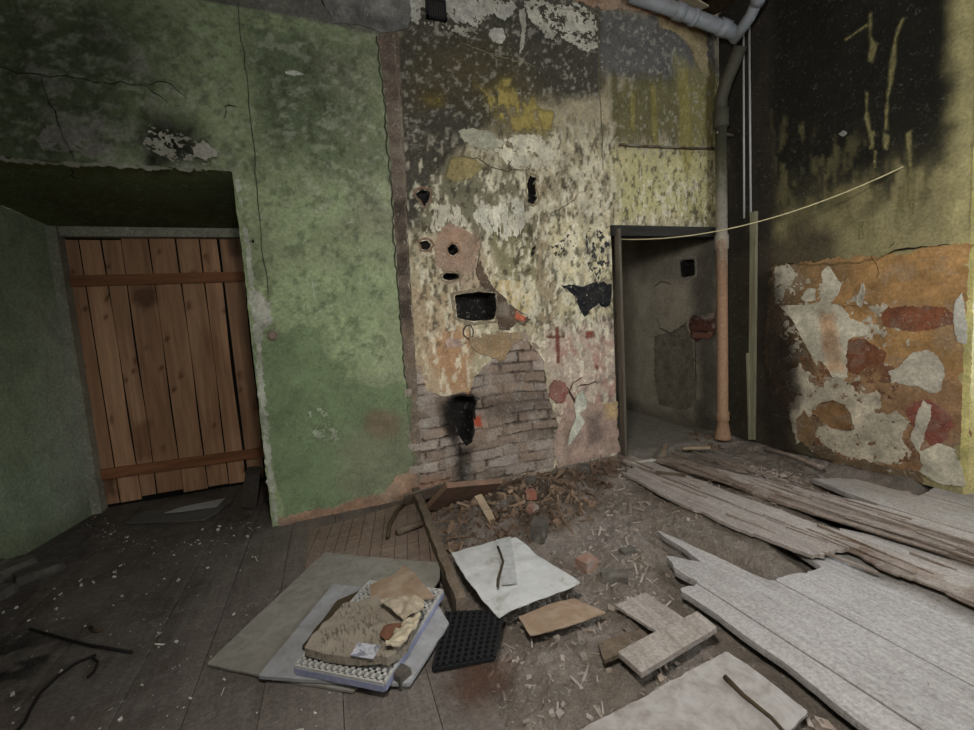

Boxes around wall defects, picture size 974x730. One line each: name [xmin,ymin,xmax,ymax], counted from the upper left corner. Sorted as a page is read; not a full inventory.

peeling [409,0,710,79]
crack [0,66,184,180]
peeling [0,113,221,173]
spalling [235,178,244,212]
crack [224,0,269,295]
spalling [413,186,433,209]
peeling [458,128,558,238]
flaking render [242,210,621,526]
spalling [654,313,715,411]
spalling [677,256,698,281]
flaking render [768,147,974,487]